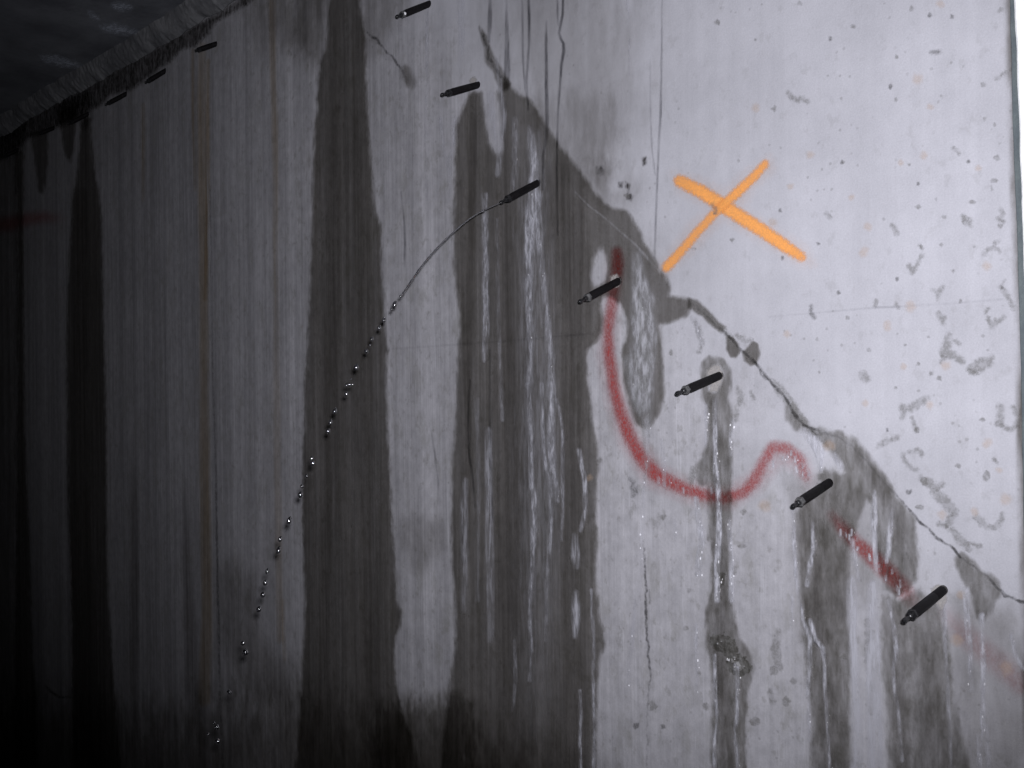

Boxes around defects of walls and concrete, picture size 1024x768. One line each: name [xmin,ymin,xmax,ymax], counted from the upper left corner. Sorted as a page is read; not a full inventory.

water stain [525,149,541,280]
water stain [631,268,654,429]
water stain [530,435,555,553]
water stain [695,409,734,602]
water stain [870,505,893,566]
water stain [793,609,826,691]
water stain [850,586,881,768]